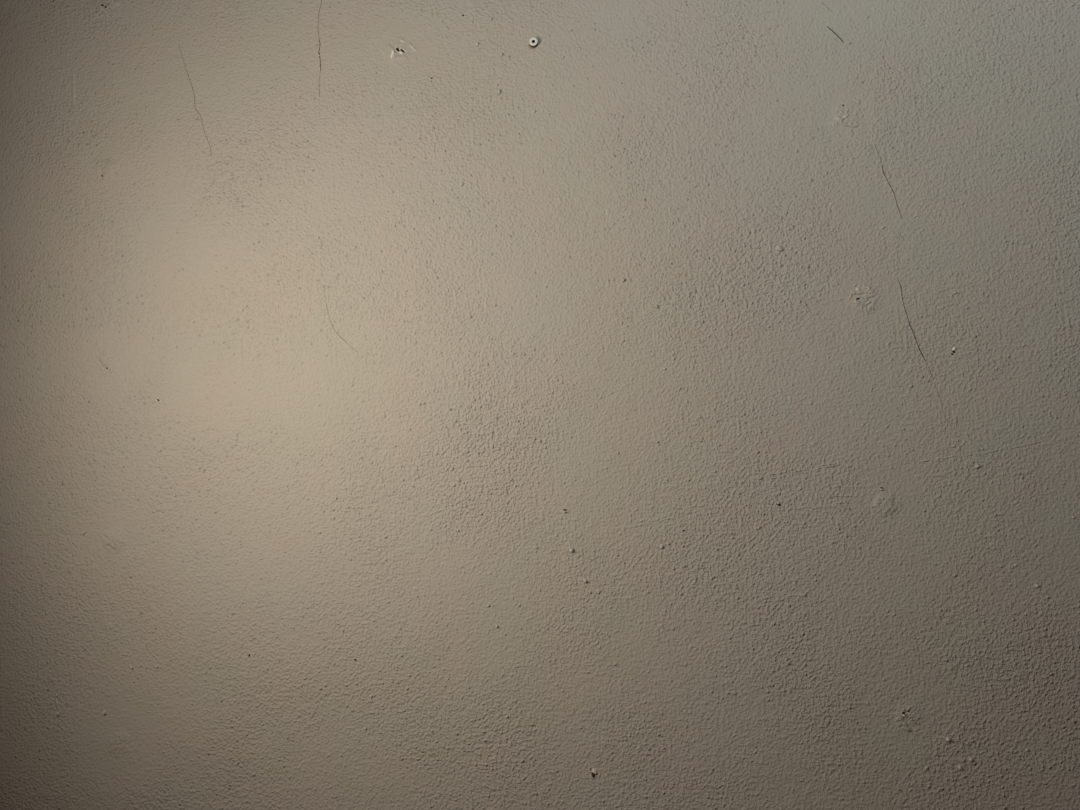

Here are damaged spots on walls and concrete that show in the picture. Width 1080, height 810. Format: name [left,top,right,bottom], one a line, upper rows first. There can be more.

crack [316,0,324,98]
crack [874,144,952,429]